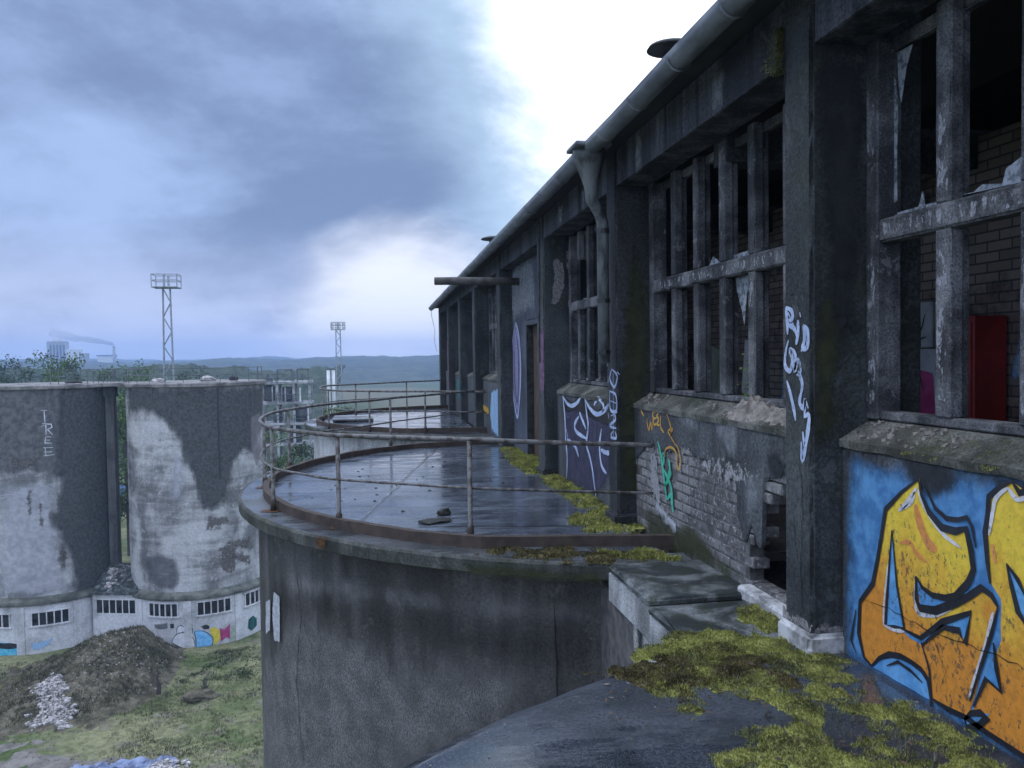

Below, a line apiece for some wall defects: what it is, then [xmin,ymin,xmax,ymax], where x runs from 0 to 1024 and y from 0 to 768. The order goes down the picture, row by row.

damp [0,387,263,591]
peeling [649,447,676,533]
peeling [671,446,758,489]
crack [552,611,560,697]